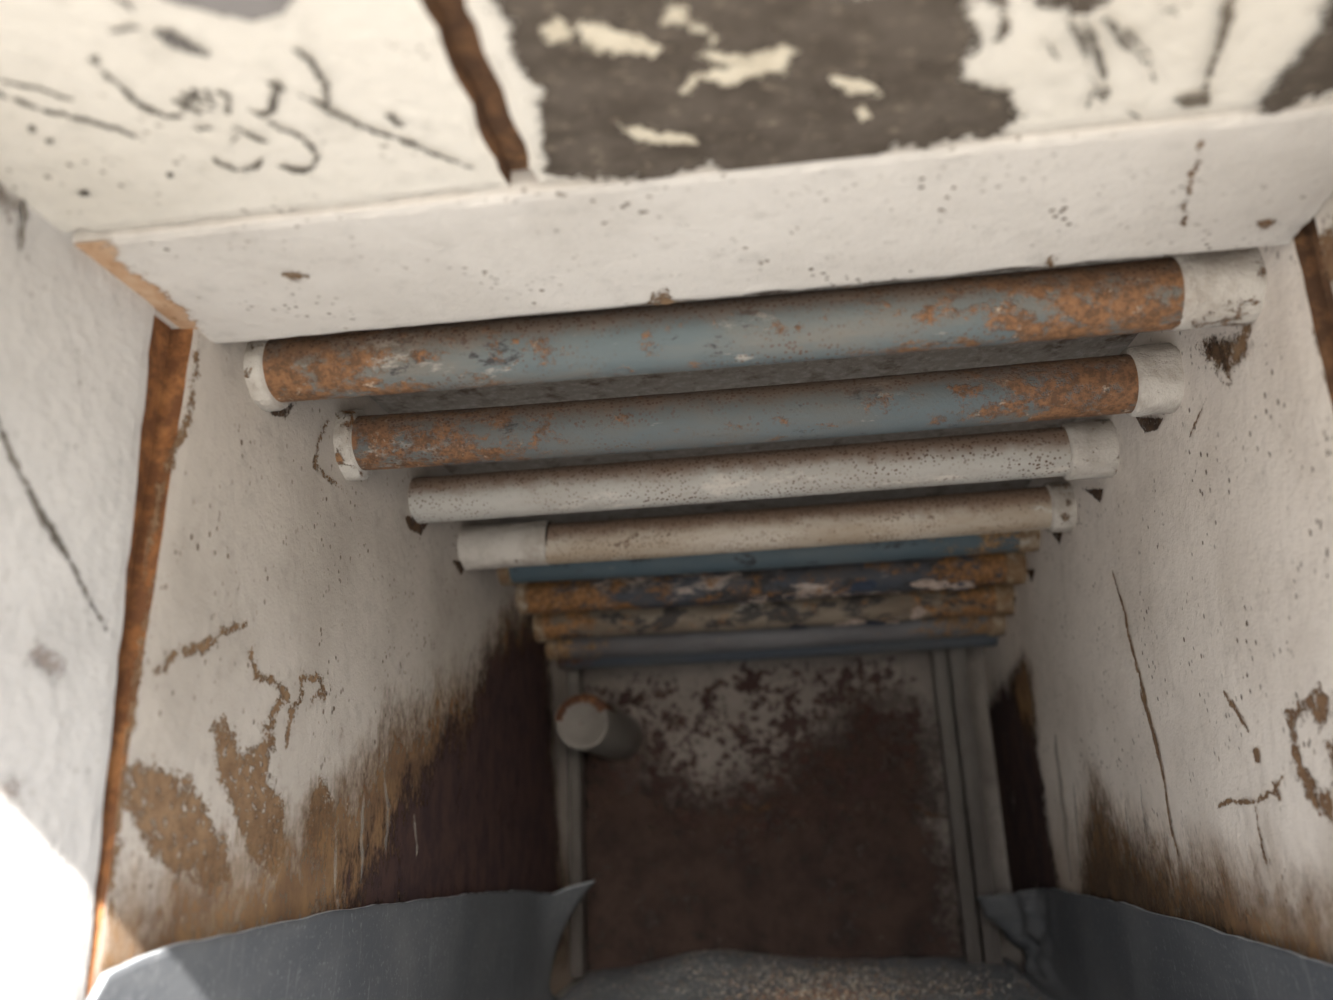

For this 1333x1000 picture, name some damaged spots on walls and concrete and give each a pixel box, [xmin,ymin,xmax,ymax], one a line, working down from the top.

crack [293,49,473,169]
spalling [485,0,1028,184]
spalling [1258,0,1333,115]
rust [281,272,310,283]
crack [0,424,108,631]
rust [74,240,201,945]
rust [1086,488,1103,502]
leakage [99,606,564,977]
leakage [583,689,964,972]
leakage [1082,778,1333,963]
crack [1217,690,1283,864]
spalling [1283,681,1333,825]